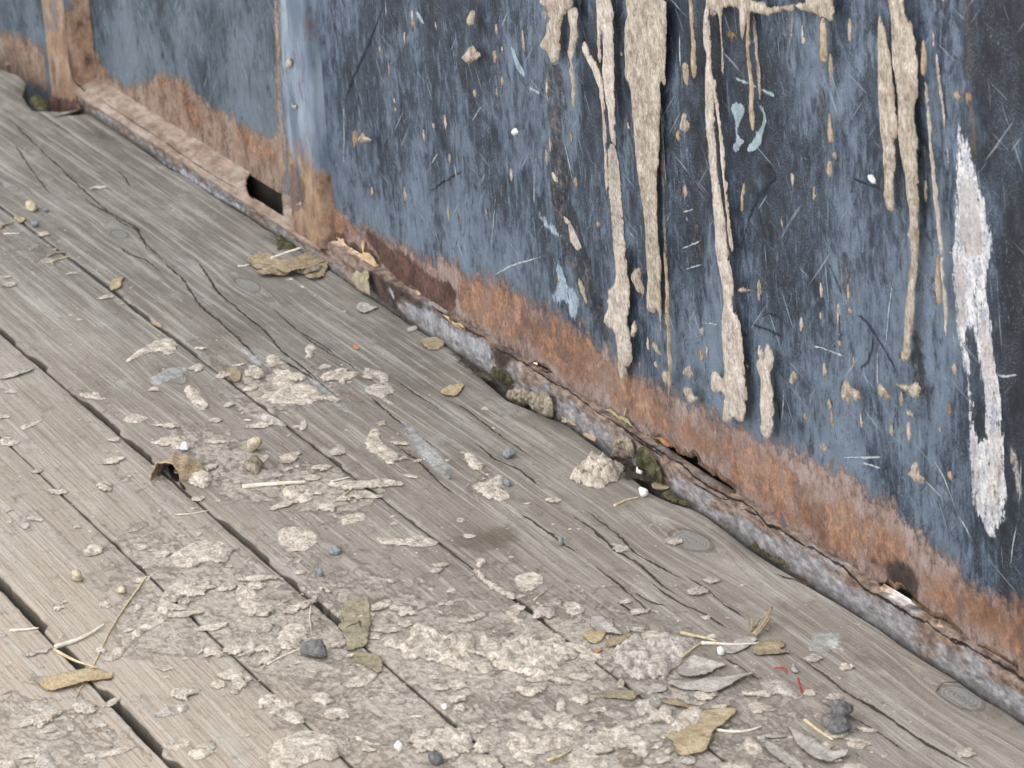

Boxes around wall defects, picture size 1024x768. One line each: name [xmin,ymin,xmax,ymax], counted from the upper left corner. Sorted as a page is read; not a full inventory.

rust [333,201,1024,673]